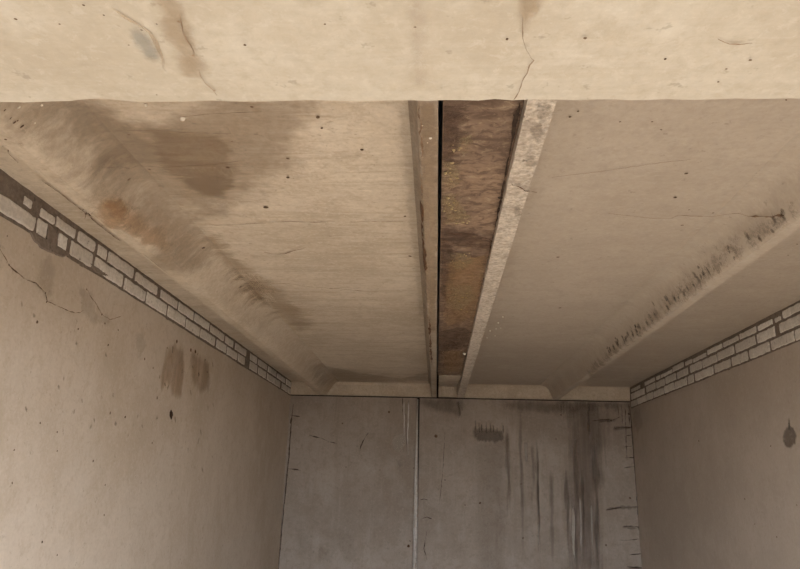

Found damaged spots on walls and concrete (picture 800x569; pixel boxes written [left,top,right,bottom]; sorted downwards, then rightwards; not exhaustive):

crack [177,17,216,94]
crack [451,22,537,259]
crack [1,251,121,324]